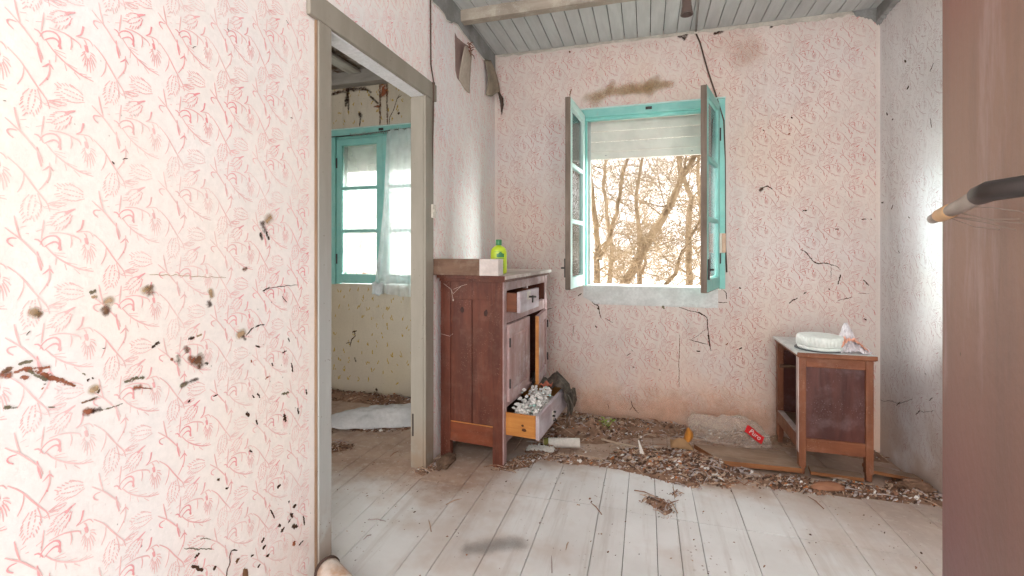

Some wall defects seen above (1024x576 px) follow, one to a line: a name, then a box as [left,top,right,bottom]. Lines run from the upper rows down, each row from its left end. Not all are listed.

crack [662,290,727,383]